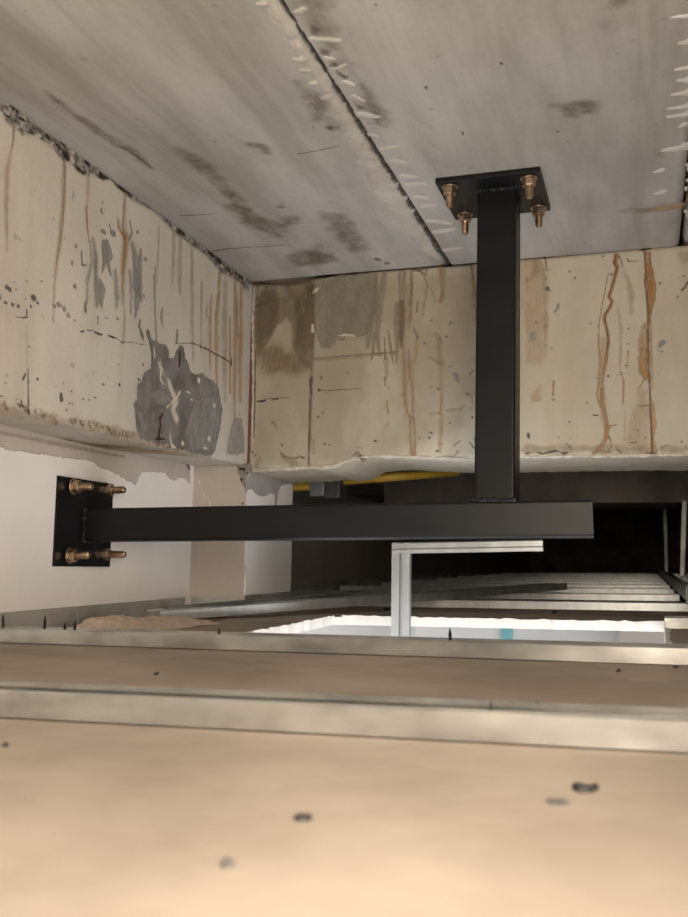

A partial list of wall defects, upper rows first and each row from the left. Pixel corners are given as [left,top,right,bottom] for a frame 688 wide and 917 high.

spalling [0,98,254,294]
peeling [0,221,294,506]
rust [206,271,221,380]
rust [229,283,256,463]
leakage [254,279,314,372]
leakage [366,258,410,372]
rust [399,283,418,456]
rust [593,253,620,454]